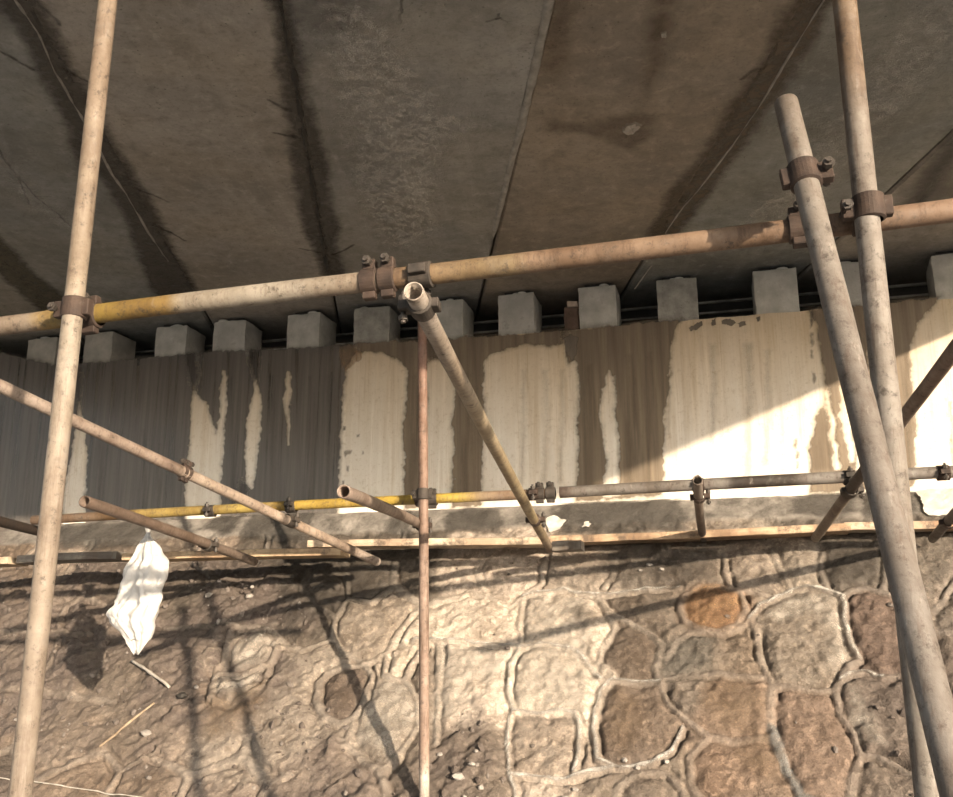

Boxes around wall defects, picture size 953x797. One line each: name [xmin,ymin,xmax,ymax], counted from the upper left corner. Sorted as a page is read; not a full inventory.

leakage [0,0,87,160]
leakage [99,129,194,296]
leakage [269,0,353,276]
spalling [595,120,642,142]
leakage [649,0,832,237]
leakage [0,394,50,524]
leakage [0,352,56,403]
leakage [59,339,438,550]
leakage [446,320,686,534]
leakage [794,305,872,515]
leakage [904,414,918,468]
leakage [890,297,939,408]